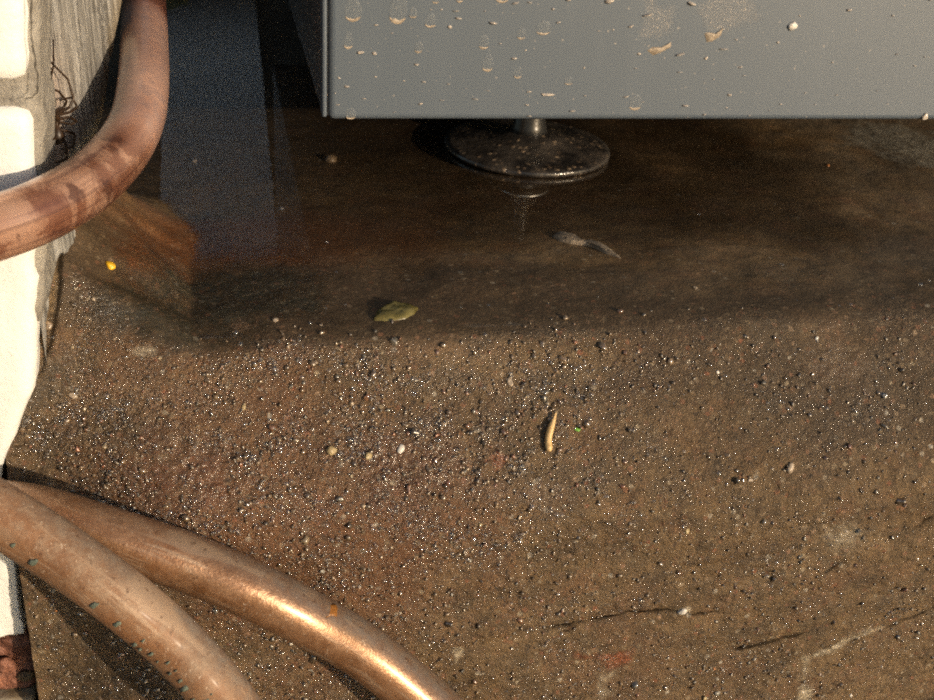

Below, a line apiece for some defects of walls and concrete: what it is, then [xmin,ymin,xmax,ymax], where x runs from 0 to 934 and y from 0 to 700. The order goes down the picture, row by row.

damp [848,123,934,168]
crack [547,585,721,632]
crack [736,630,812,651]